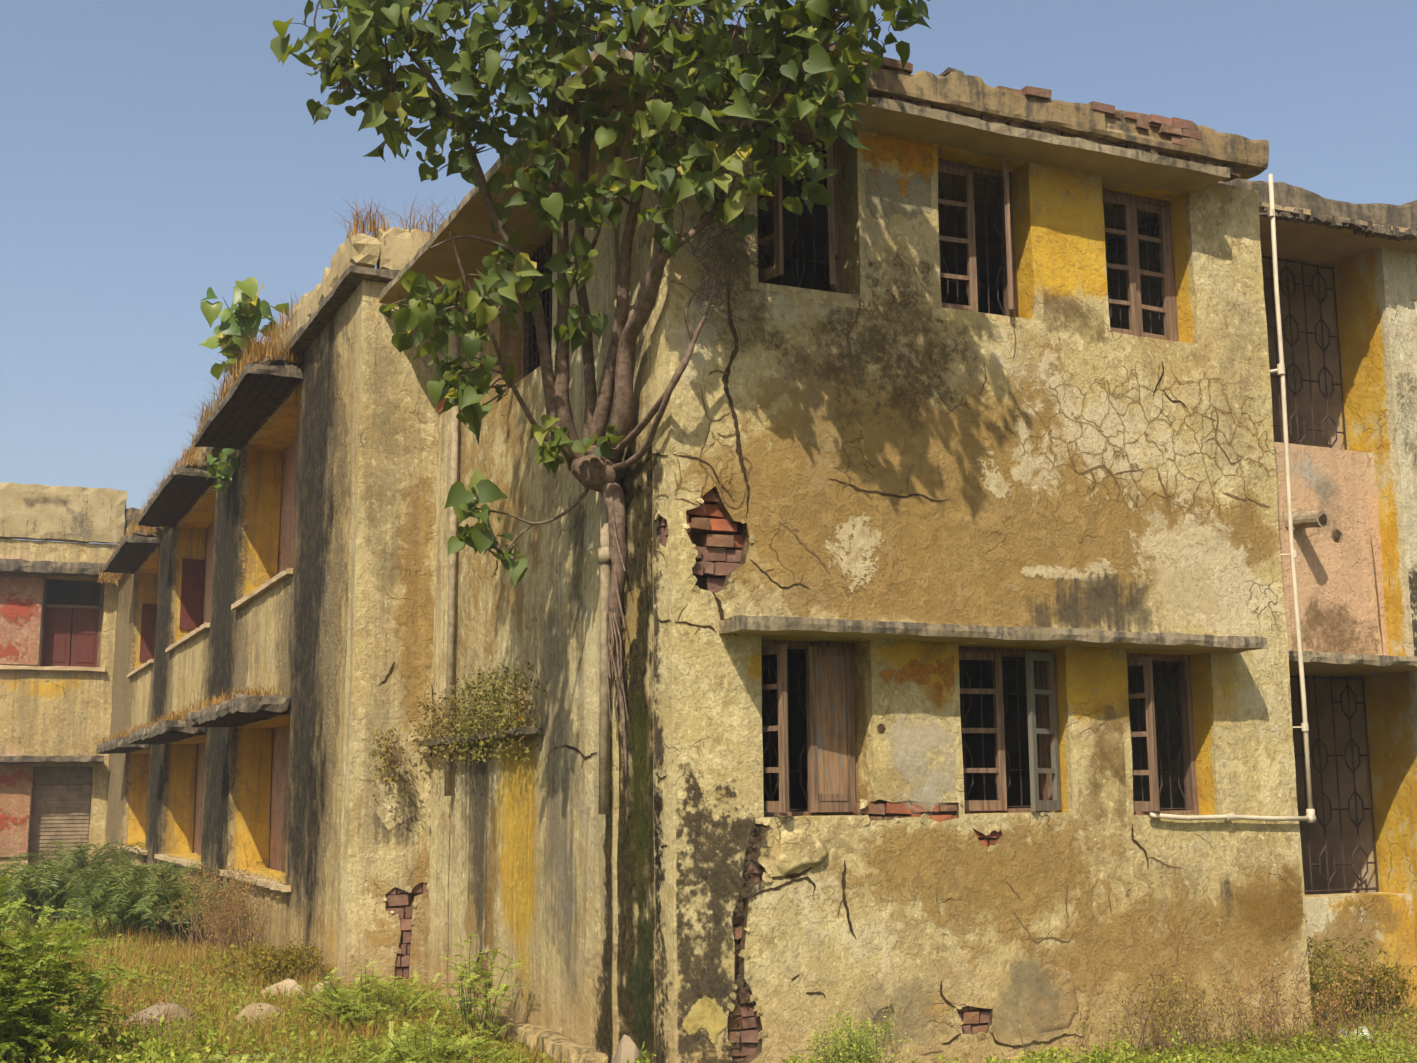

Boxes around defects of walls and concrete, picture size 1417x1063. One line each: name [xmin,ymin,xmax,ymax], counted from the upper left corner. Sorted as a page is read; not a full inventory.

crack [647,284,832,590]
crack [829,452,949,502]
flaking render [651,488,755,593]
peeling [825,514,885,592]
damp [282,319,338,952]
damp [1408,566,1417,656]
damp [592,446,774,1063]
flaking render [853,799,963,826]
flaking render [383,882,429,985]
crack [752,860,857,940]
flaking render [726,984,768,1062]
crack [886,981,1084,1063]